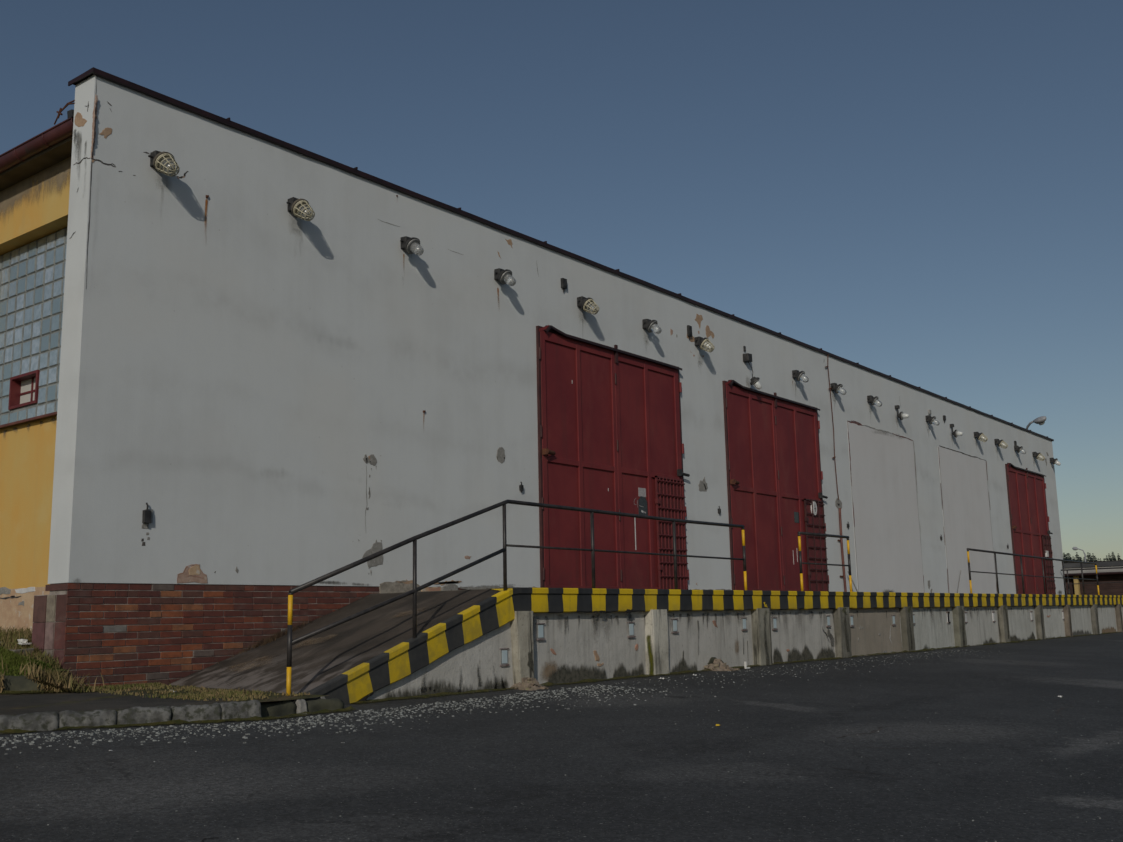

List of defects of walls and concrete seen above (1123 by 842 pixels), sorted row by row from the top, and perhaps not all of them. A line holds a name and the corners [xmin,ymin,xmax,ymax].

flaking render [75,95,112,163]
crack [71,152,149,288]
peeling [670,314,714,357]
flaking render [177,564,208,584]
leakage [773,612,835,664]
leakage [386,668,508,700]
leakage [527,651,644,684]
leakage [672,651,697,672]